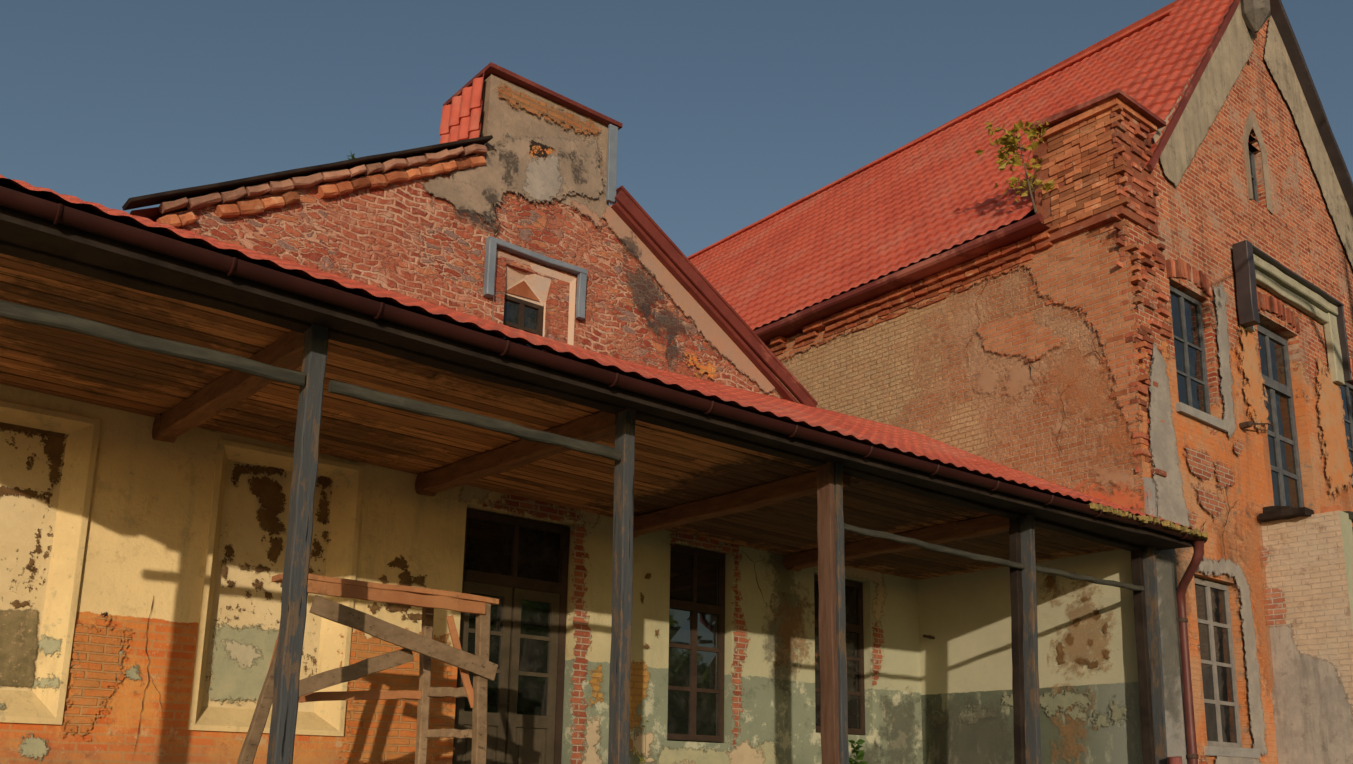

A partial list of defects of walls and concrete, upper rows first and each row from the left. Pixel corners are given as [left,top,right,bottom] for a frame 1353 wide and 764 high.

spalling [527,140,557,160]
flaking render [496,80,601,139]
peeling [0,422,68,513]
peeling [27,528,42,577]
peeling [220,462,287,600]
peeling [309,476,333,574]
crack [134,596,163,754]
spalling [568,522,603,764]
peeling [629,554,781,764]
peeling [1056,596,1110,670]
flaking render [1262,586,1287,627]